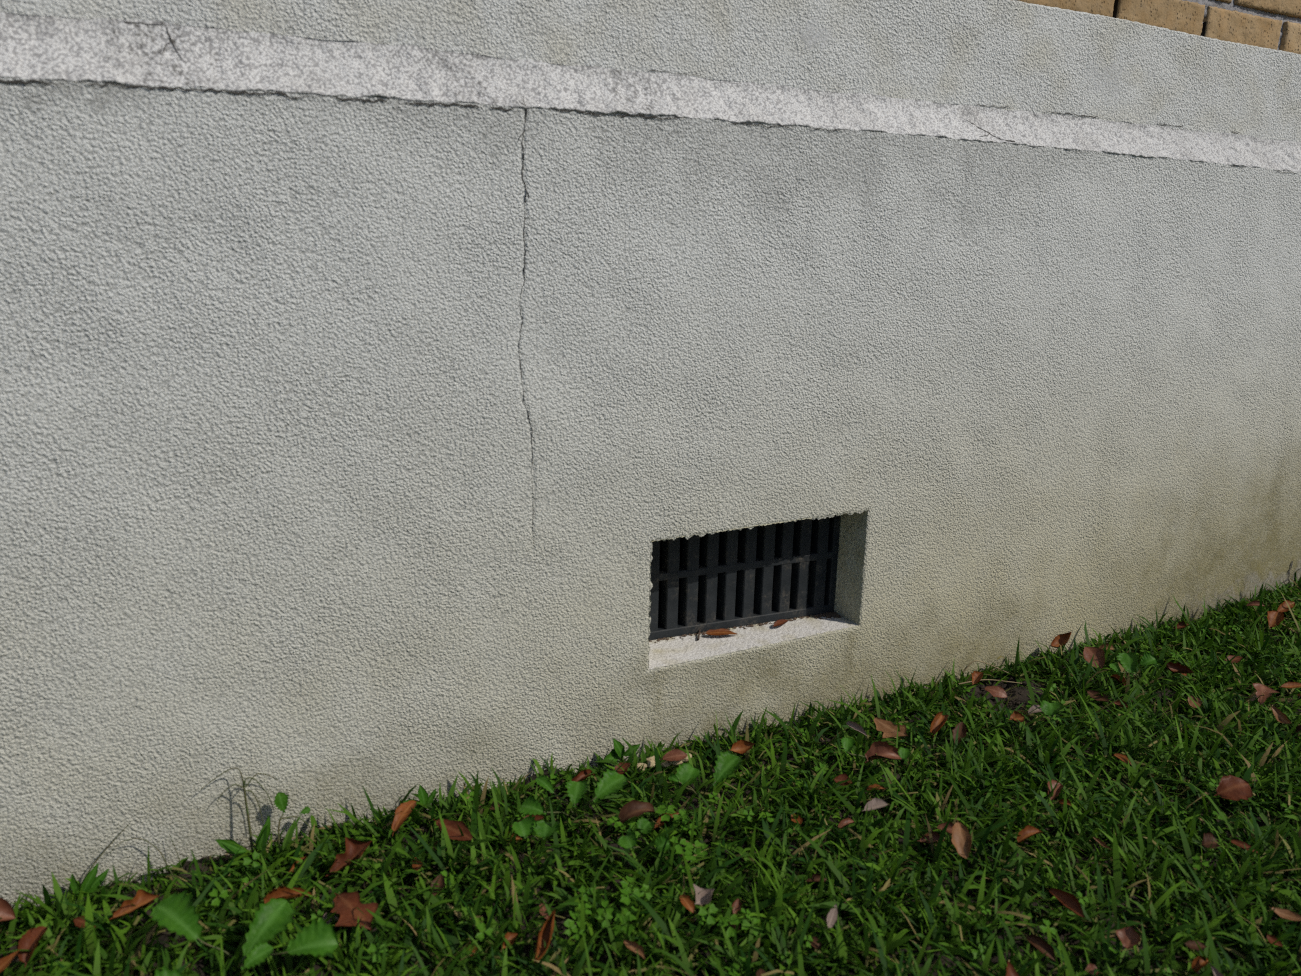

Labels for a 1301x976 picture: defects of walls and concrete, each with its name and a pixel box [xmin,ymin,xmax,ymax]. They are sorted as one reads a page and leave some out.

crack [0,21,686,545]
crack [728,122,840,131]